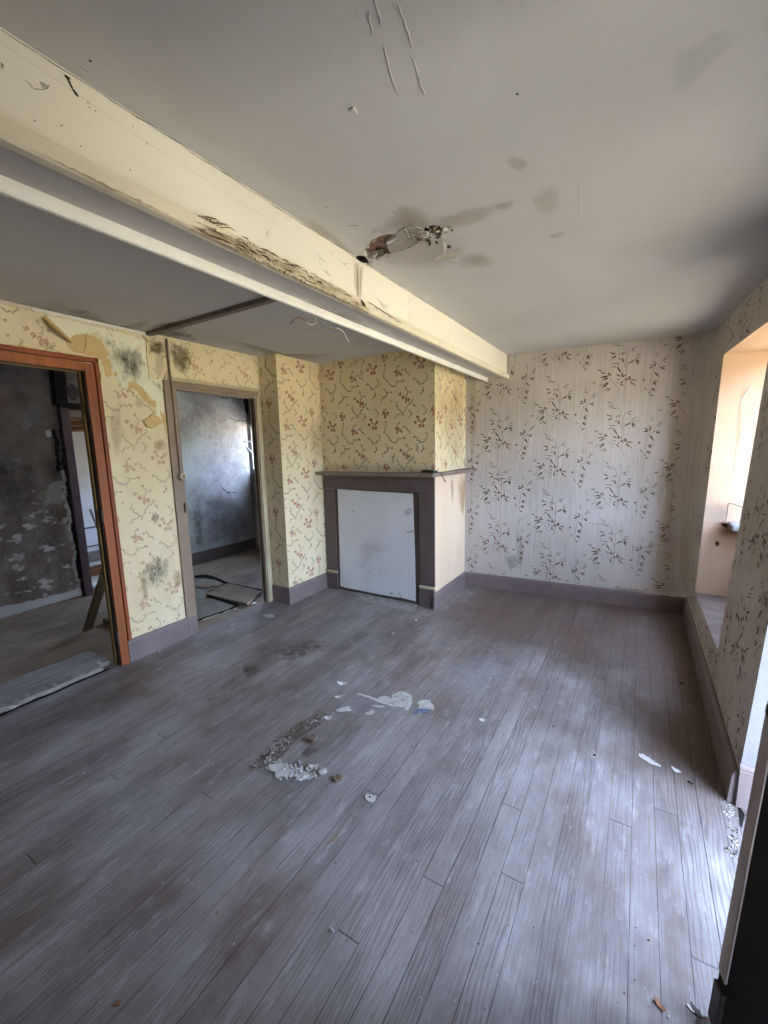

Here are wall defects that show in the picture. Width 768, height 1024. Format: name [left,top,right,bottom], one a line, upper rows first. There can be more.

crack [369,2,424,92]
crack [1,29,437,310]
spalling [189,215,388,313]
spalling [388,225,453,253]
spalling [66,379,81,404]
peeling [144,414,162,429]
damp [173,348,189,368]
spalling [0,429,83,619]